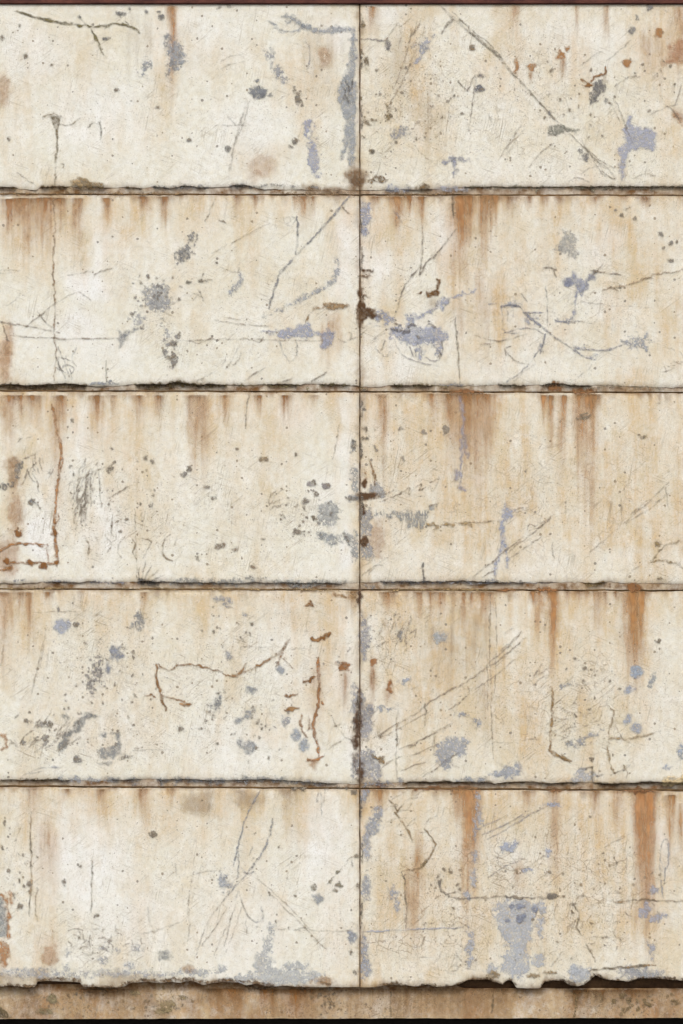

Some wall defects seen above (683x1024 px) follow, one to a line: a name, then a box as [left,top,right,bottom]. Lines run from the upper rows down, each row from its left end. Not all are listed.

peeling [272,15,417,165]
peeling [619,116,655,173]
rust [5,197,82,224]
rust [454,195,510,244]
peeling [119,274,180,346]
peeling [375,291,473,359]
rust [429,388,490,428]
rust [541,381,600,436]
rust [530,583,645,653]
rust [414,785,480,855]
rust [613,786,656,893]
peeling [383,898,683,1017]